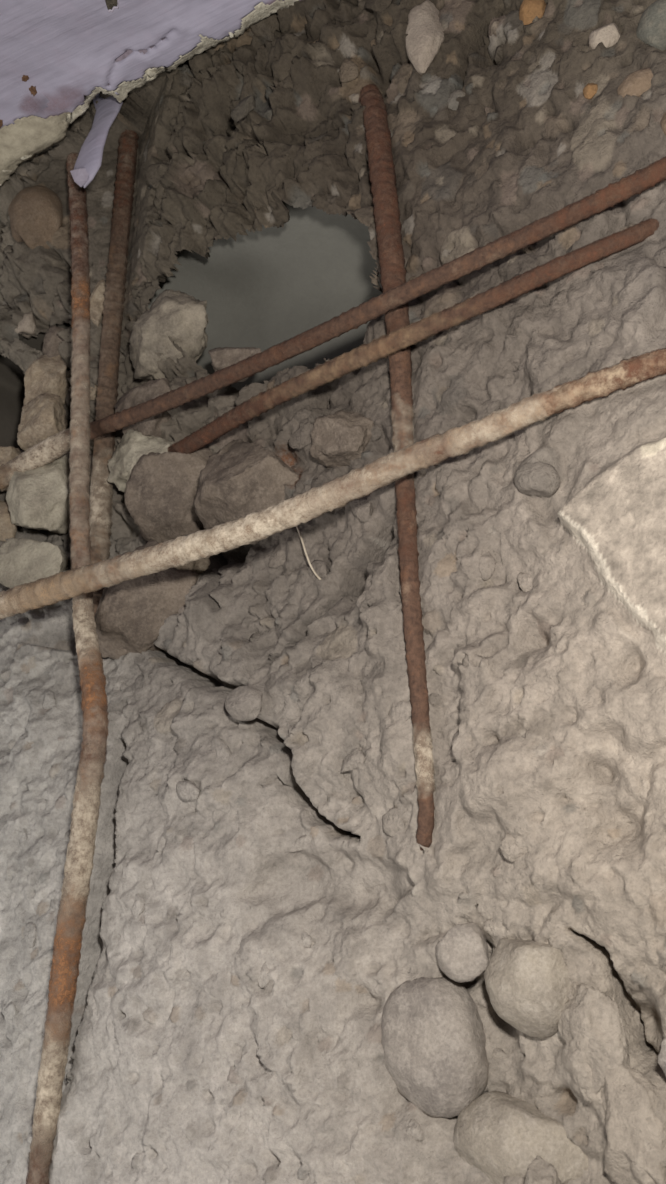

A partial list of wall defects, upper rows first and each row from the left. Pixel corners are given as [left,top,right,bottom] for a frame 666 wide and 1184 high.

spalling [0,153,147,570]
spalling [0,0,666,500]
spalling [0,348,666,1184]